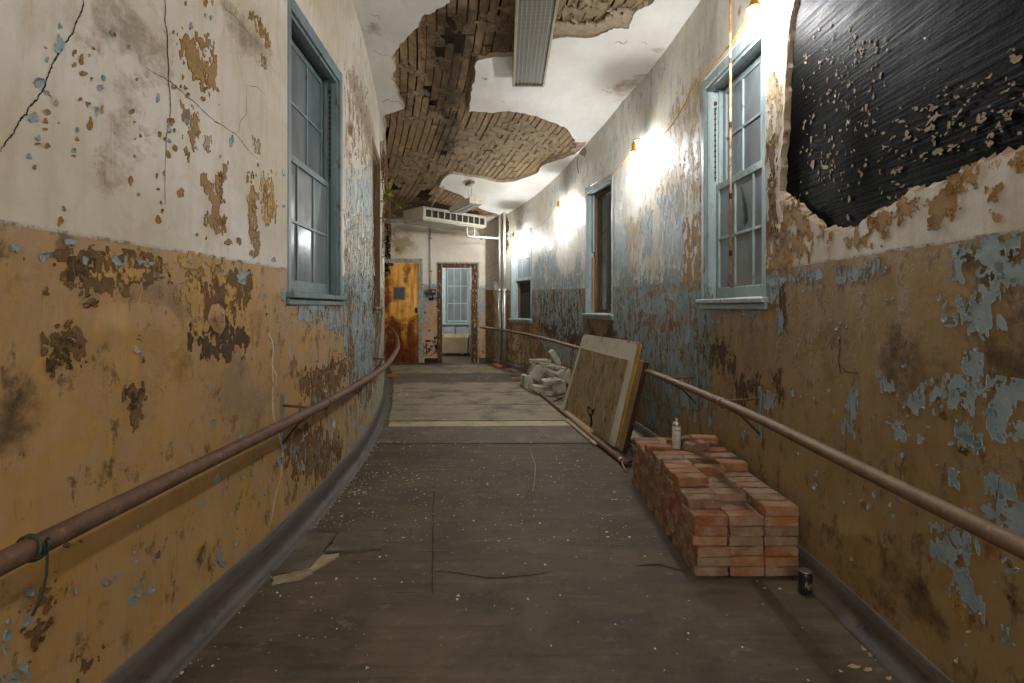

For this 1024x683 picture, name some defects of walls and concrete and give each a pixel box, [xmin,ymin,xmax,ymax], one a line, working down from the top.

crack [1,1,84,152]
peeling [26,77,60,170]
crack [149,4,276,161]
flaking render [552,0,654,40]
flaking render [38,22,286,363]
peeling [276,0,586,486]
flaking render [610,0,1024,458]
peeling [41,320,88,378]
peeling [122,381,148,433]
peeling [934,464,960,491]
peeling [963,472,1024,537]
peeling [928,519,985,646]